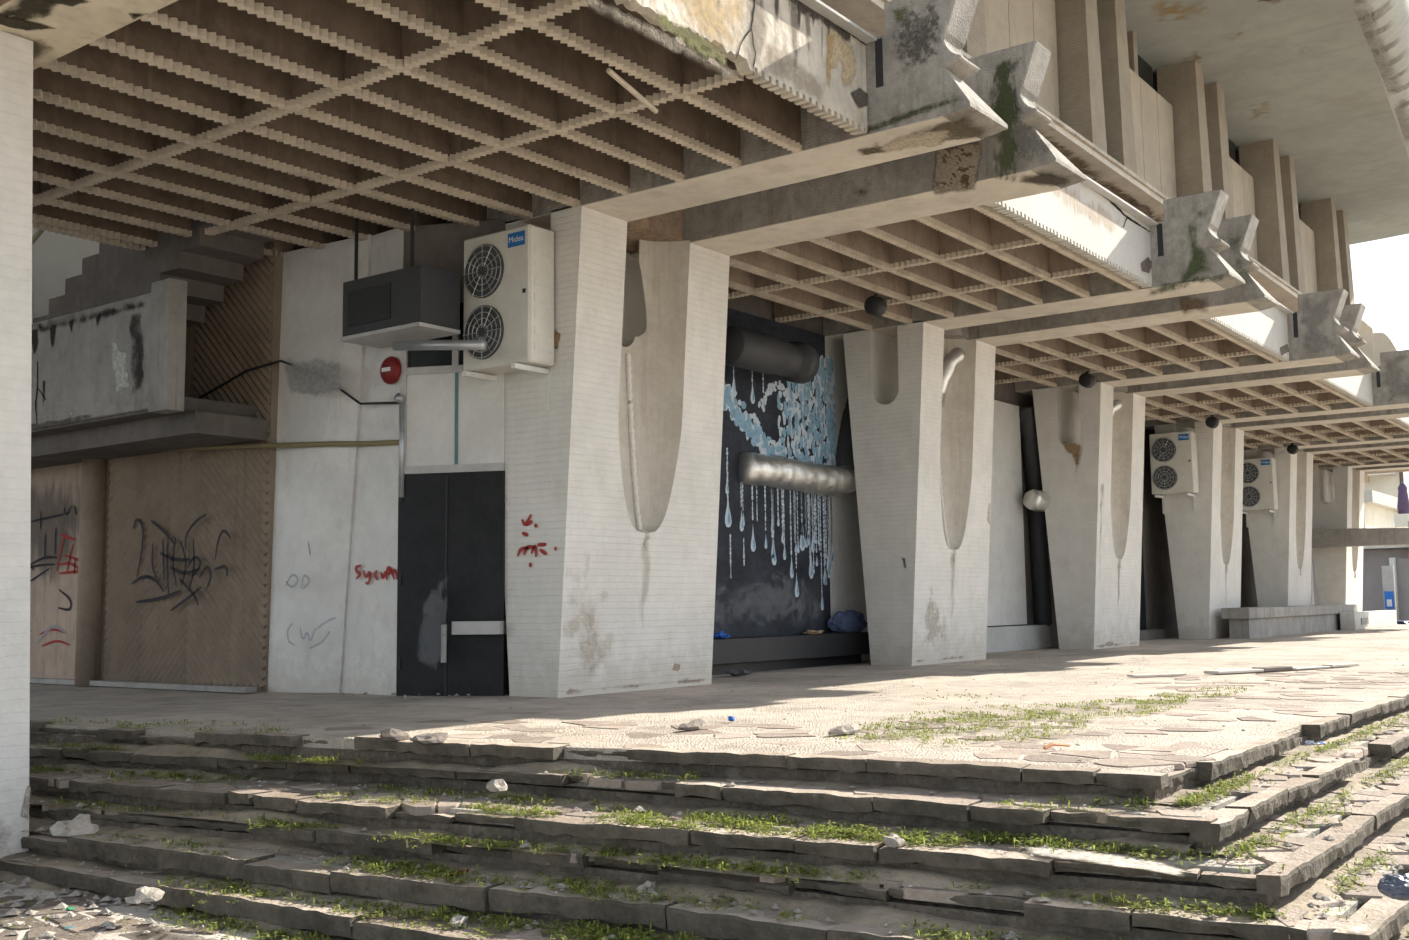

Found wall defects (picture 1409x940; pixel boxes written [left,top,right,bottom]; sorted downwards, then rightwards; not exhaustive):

water stain [0,0,88,57]
crack [736,0,756,76]
water stain [694,0,850,64]
water stain [897,5,939,66]
water stain [1355,0,1397,91]
spalling [879,130,981,194]